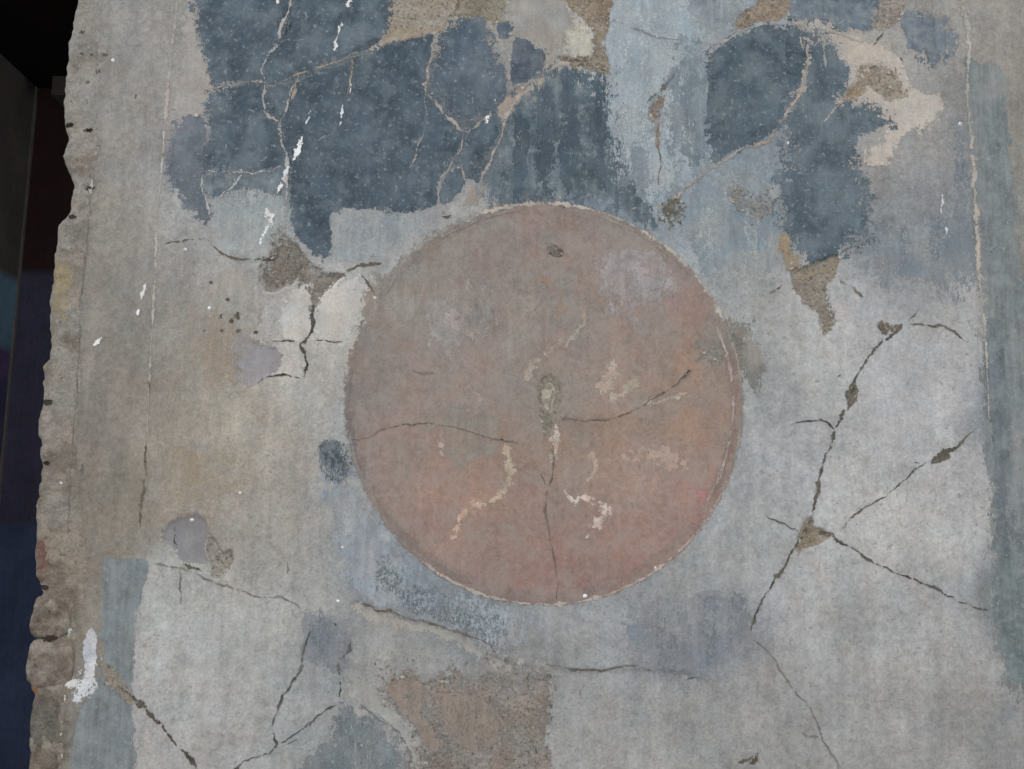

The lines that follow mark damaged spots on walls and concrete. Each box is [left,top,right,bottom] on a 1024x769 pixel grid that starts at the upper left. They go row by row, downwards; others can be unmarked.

peeling [163,0,687,387]
crack [165,0,884,262]
peeling [686,0,959,335]
spalling [26,0,122,769]
crack [118,686,197,767]
flaking render [159,510,234,578]
crack [155,527,300,608]
crack [234,623,413,769]
flaking render [335,599,571,769]
flaking render [537,374,563,437]
crack [541,370,692,625]
crack [751,309,987,769]